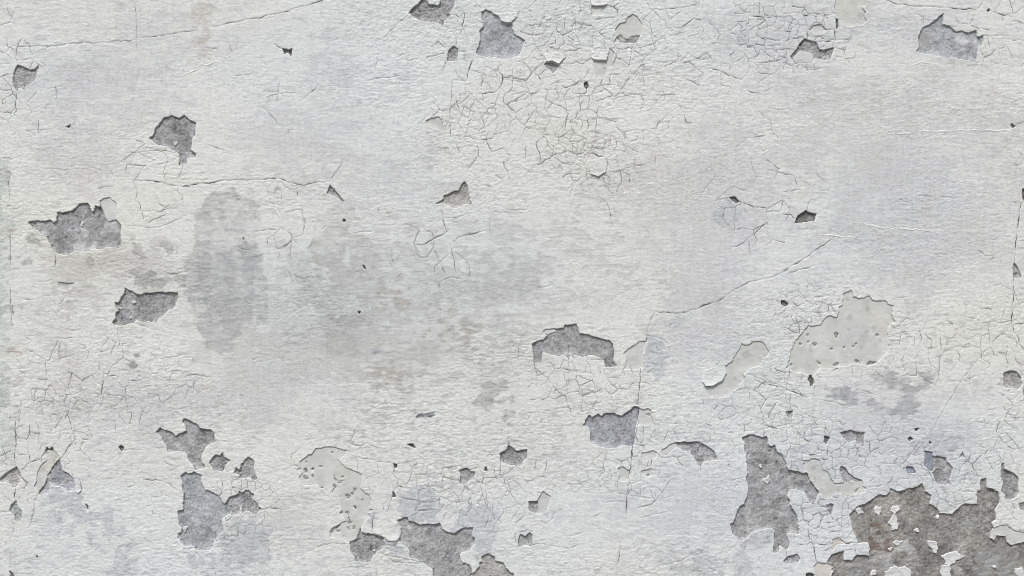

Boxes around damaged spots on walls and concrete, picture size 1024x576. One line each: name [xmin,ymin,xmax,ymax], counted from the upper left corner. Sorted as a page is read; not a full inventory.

peeling [476,10,525,59]
peeling [150,116,196,166]
crack [354,0,856,347]
peeling [29,197,121,255]
peeling [113,289,178,328]
crack [2,256,206,525]
peeling [532,324,646,370]
crack [703,205,1024,564]
peeling [583,406,716,481]
peeling [157,419,262,551]
peeling [730,435,1024,576]
peeling [398,517,514,576]